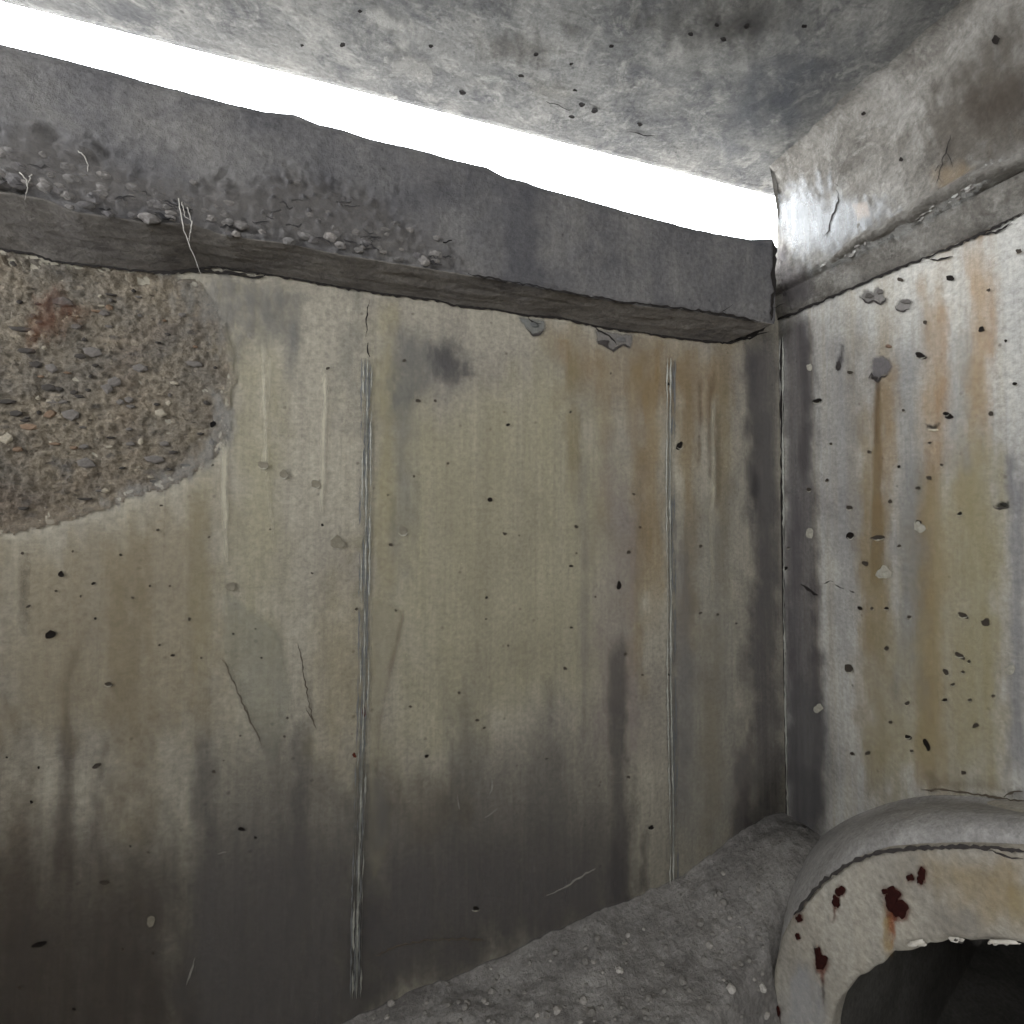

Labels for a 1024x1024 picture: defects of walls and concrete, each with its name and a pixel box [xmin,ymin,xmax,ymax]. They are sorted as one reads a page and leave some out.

crack [825,184,839,235]
crack [0,212,1023,357]
spalling [860,288,911,312]
spalling [0,252,237,535]
spalling [869,344,892,383]
crack [223,661,262,745]
damp [194,813,360,1024]
damp [367,821,629,983]
rust [832,885,846,908]
rust [881,886,909,933]
damp [0,920,163,1024]
rust [814,947,828,996]